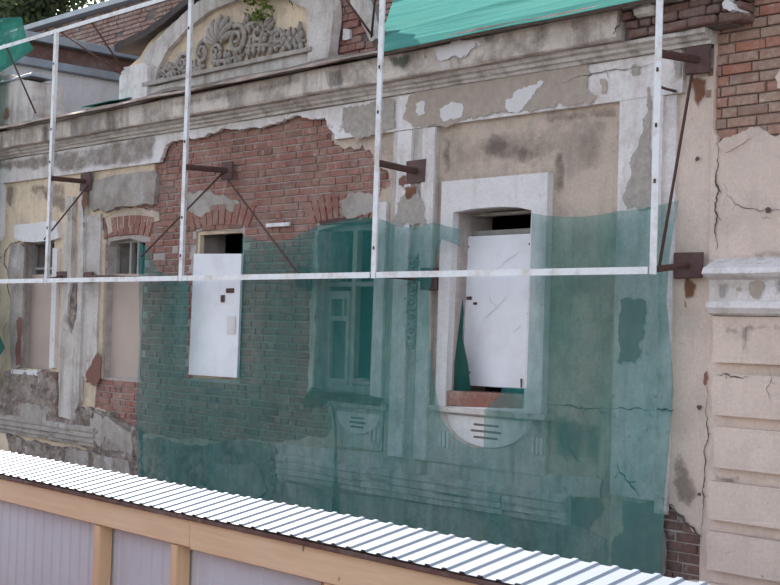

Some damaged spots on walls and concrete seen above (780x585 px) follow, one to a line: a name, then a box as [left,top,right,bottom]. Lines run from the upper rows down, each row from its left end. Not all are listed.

peeling [440,102,464,122]
peeling [505,80,544,114]
peeling [622,87,652,209]
flaking render [618,0,780,152]
crack [714,147,779,247]
flaking render [0,98,426,501]
crack [669,373,747,544]
flaking render [610,502,700,580]